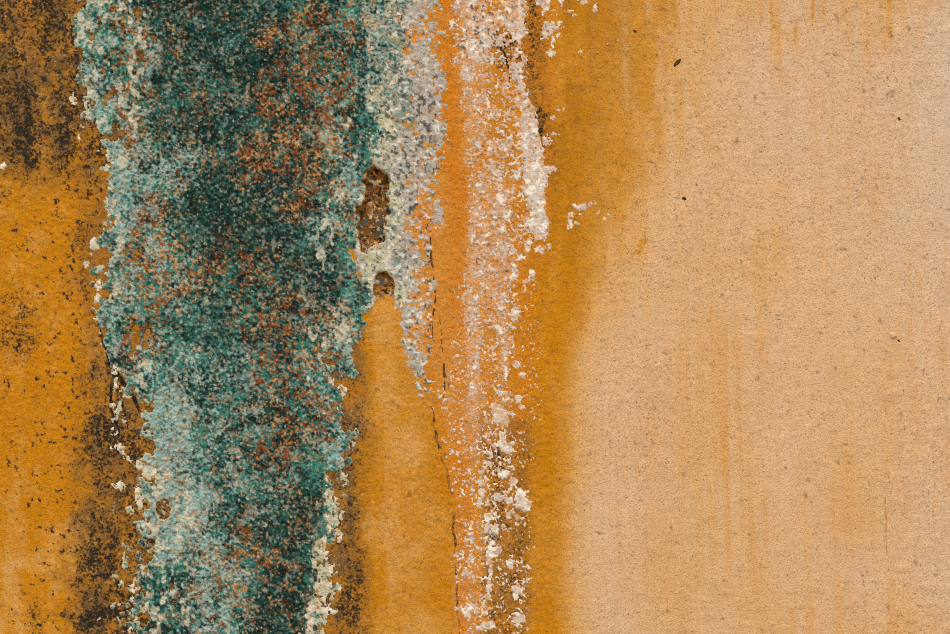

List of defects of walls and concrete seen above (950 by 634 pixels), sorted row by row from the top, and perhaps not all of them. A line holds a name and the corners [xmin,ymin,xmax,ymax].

water stain [0,0,171,634]
corrosion [382,0,460,374]
peeling [353,0,598,634]
corrosion [512,0,569,427]
peeling [566,200,610,230]
water stain [306,0,950,634]